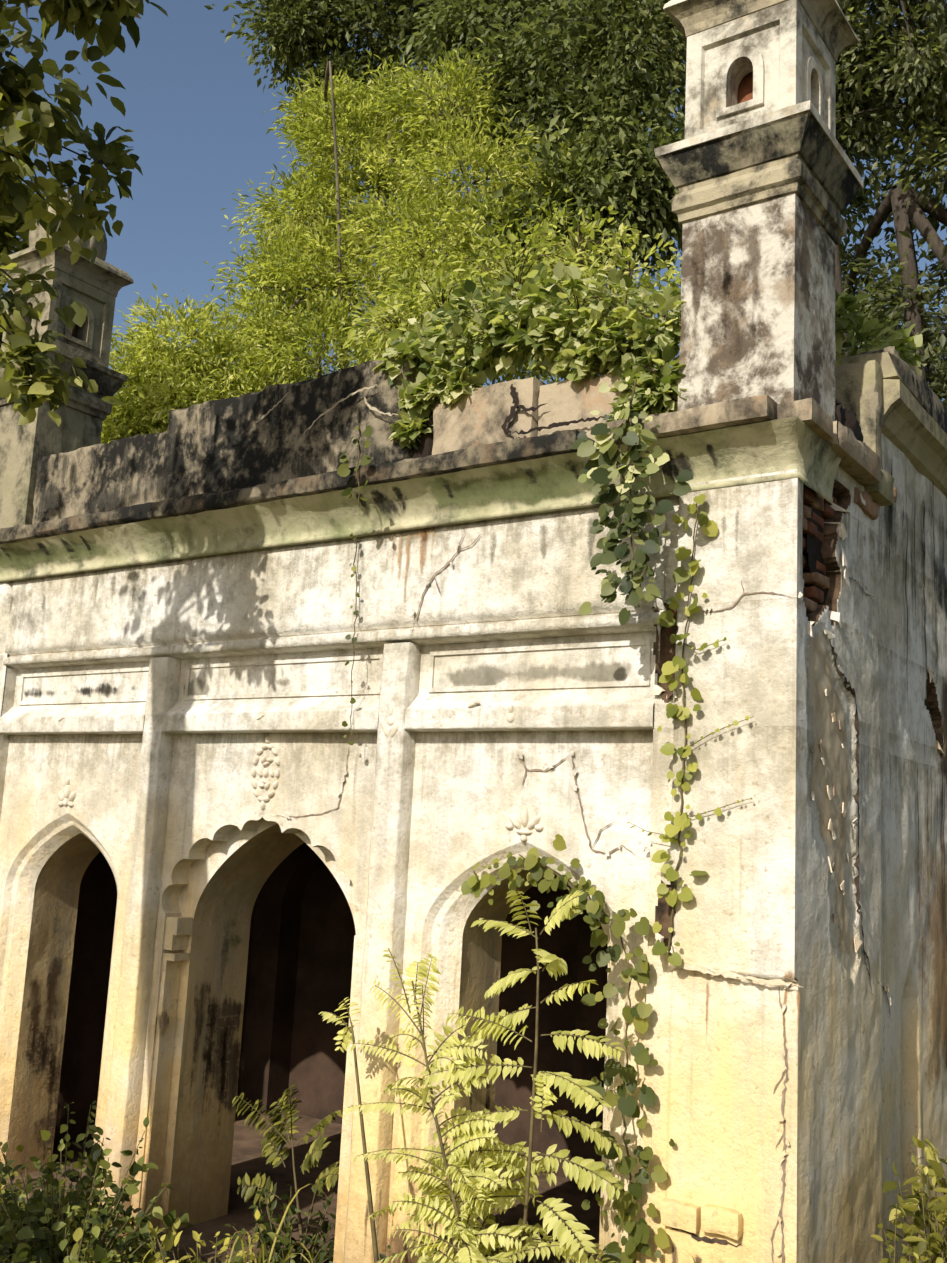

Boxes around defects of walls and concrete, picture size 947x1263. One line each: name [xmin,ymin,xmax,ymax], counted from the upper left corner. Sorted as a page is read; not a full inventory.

water stain [691,225,760,353]
water stain [291,456,322,477]
water stain [356,487,406,514]
crack [501,384,614,438]
crack [411,534,481,637]
flaking render [802,487,897,954]
water stain [881,481,947,946]
crack [830,641,892,1022]
water stain [25,957,65,1160]
water stain [190,984,244,1112]
crack [670,987,790,1263]